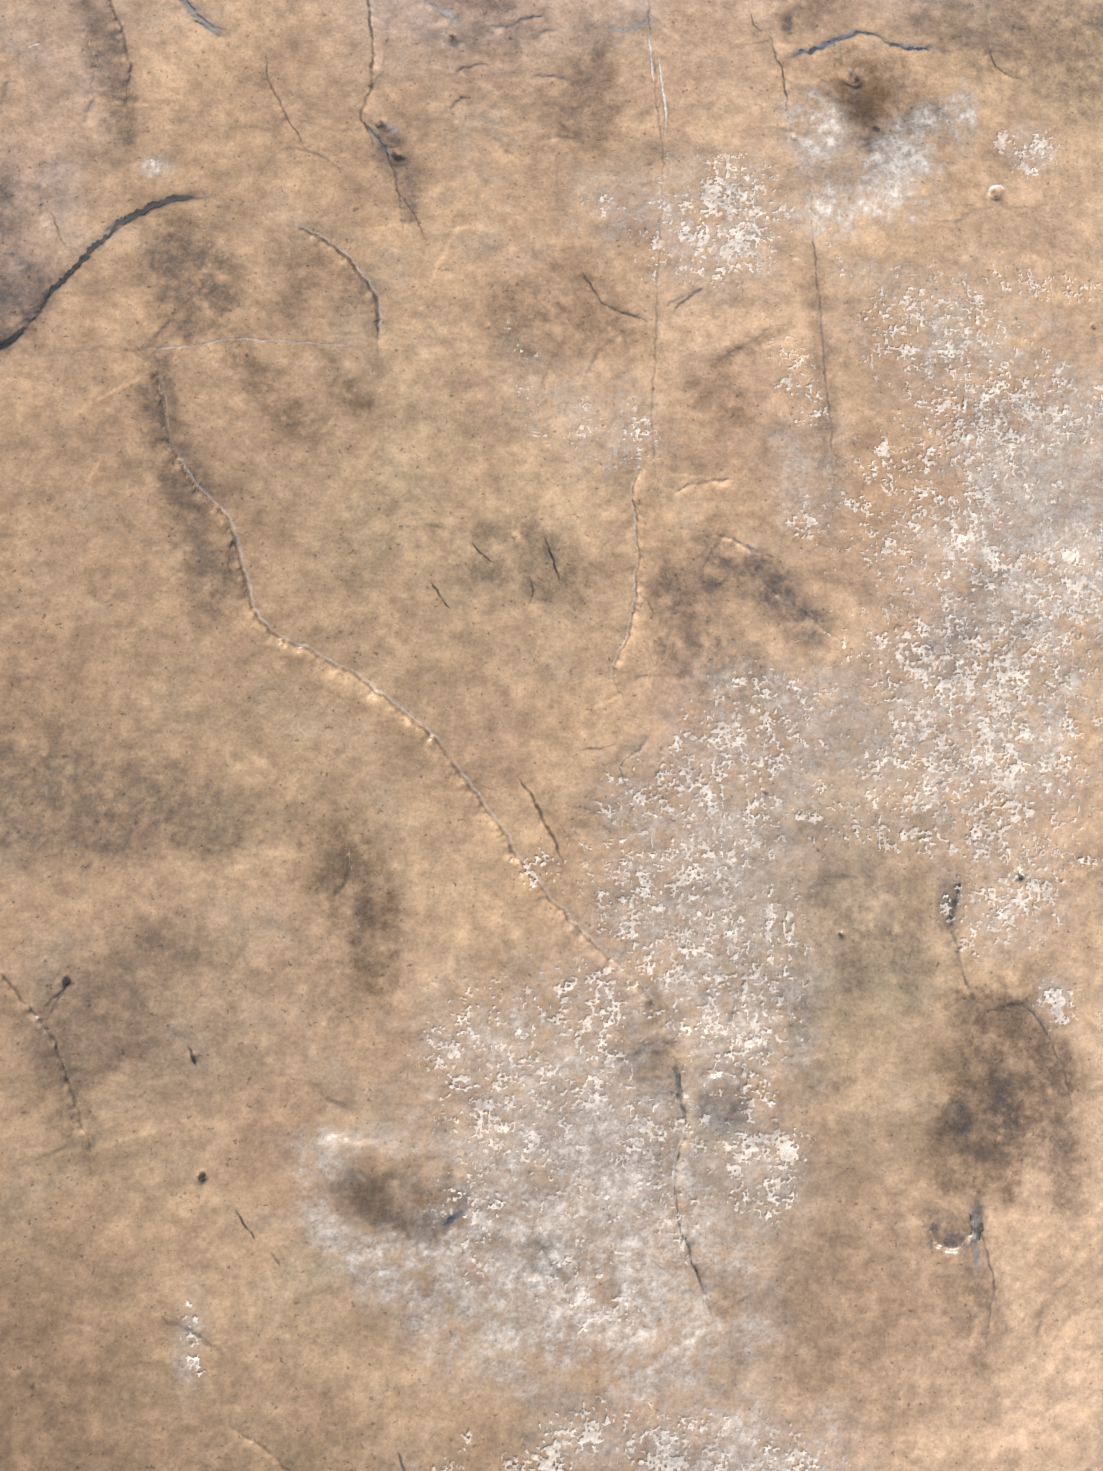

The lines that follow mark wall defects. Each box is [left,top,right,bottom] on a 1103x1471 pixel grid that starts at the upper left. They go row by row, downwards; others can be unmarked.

leakage [658,60,667,123]
leakage [581,91,976,288]
leakage [993,131,1060,178]
crack [522,784,558,847]
leakage [309,269,1103,1471]
crack [674,1103,701,1282]